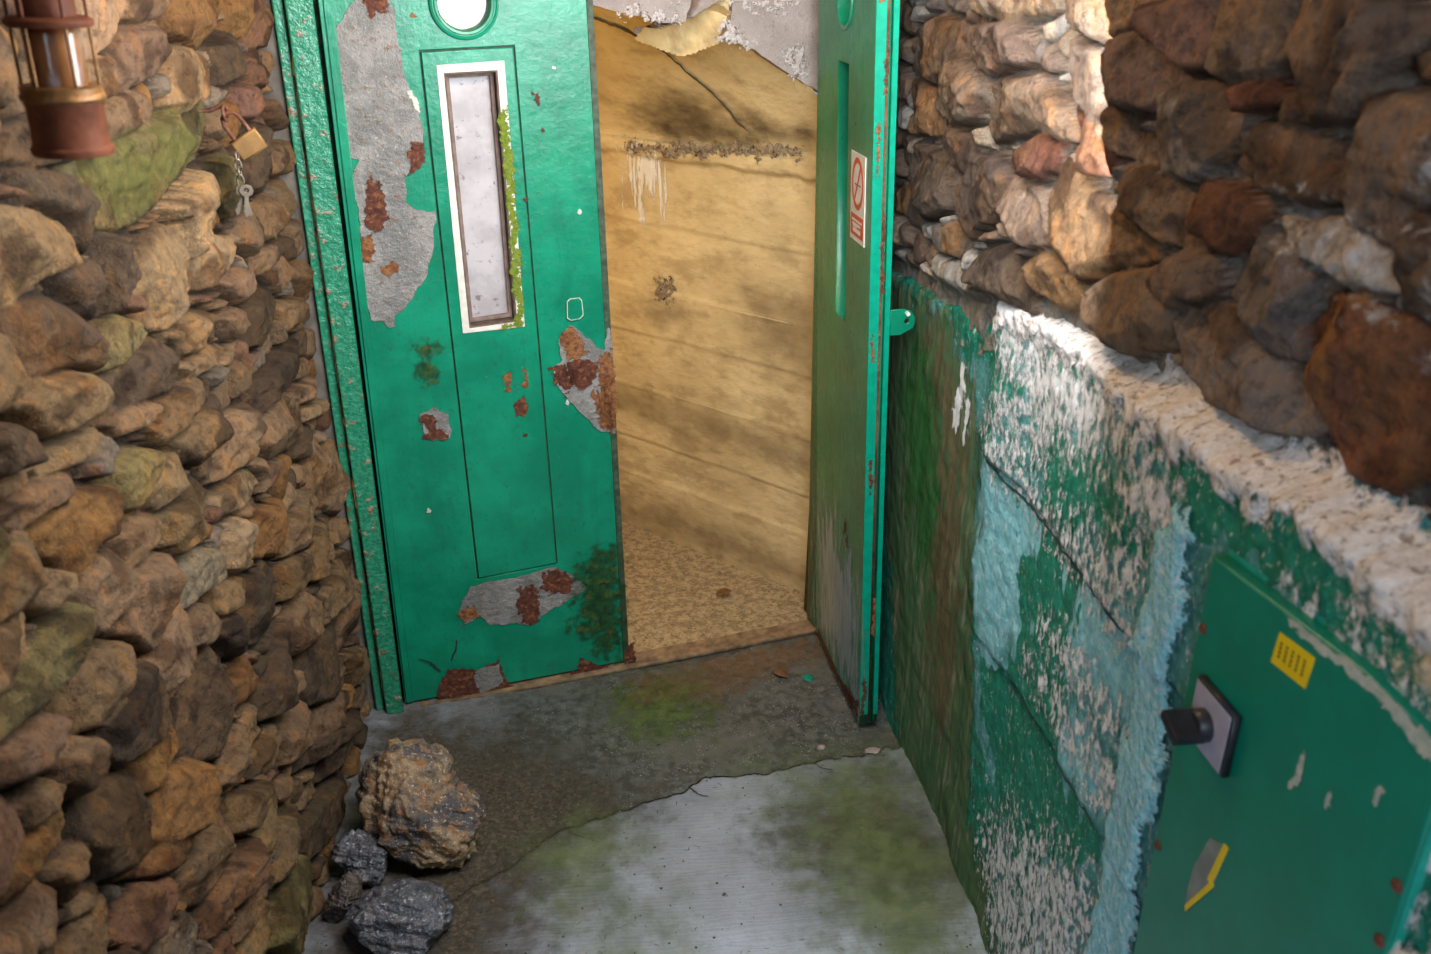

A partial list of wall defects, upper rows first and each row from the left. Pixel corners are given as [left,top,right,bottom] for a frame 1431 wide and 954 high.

crack [594,17,751,134]
spalling [616,0,801,56]
peeling [336,0,436,328]
damp [613,139,675,226]
peeling [548,325,617,434]
damp [952,324,1184,667]
peeling [457,566,585,626]
damp [765,751,961,902]
crack [1389,940,1418,954]